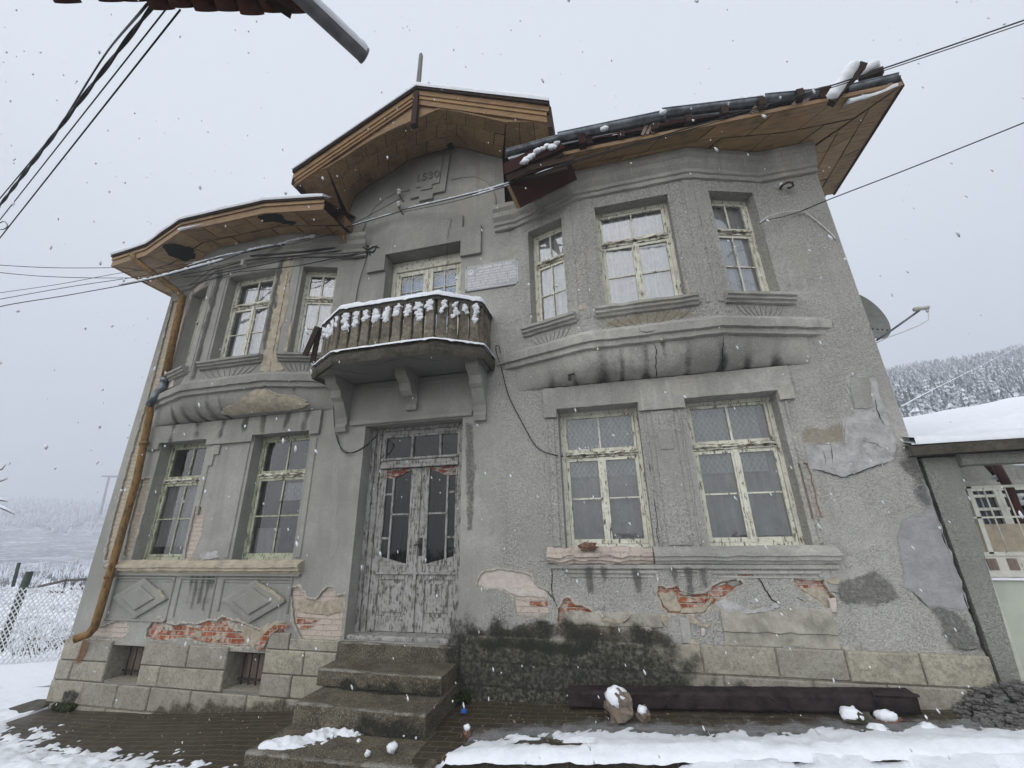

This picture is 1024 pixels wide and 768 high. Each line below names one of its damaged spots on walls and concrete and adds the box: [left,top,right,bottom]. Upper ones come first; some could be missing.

spalling [144,582,347,651]
spalling [476,567,602,624]
leakage [586,568,606,592]
leakage [672,568,706,595]
spalling [653,570,779,645]
spalling [792,575,842,616]
leakage [839,573,895,603]
leakage [446,617,699,704]